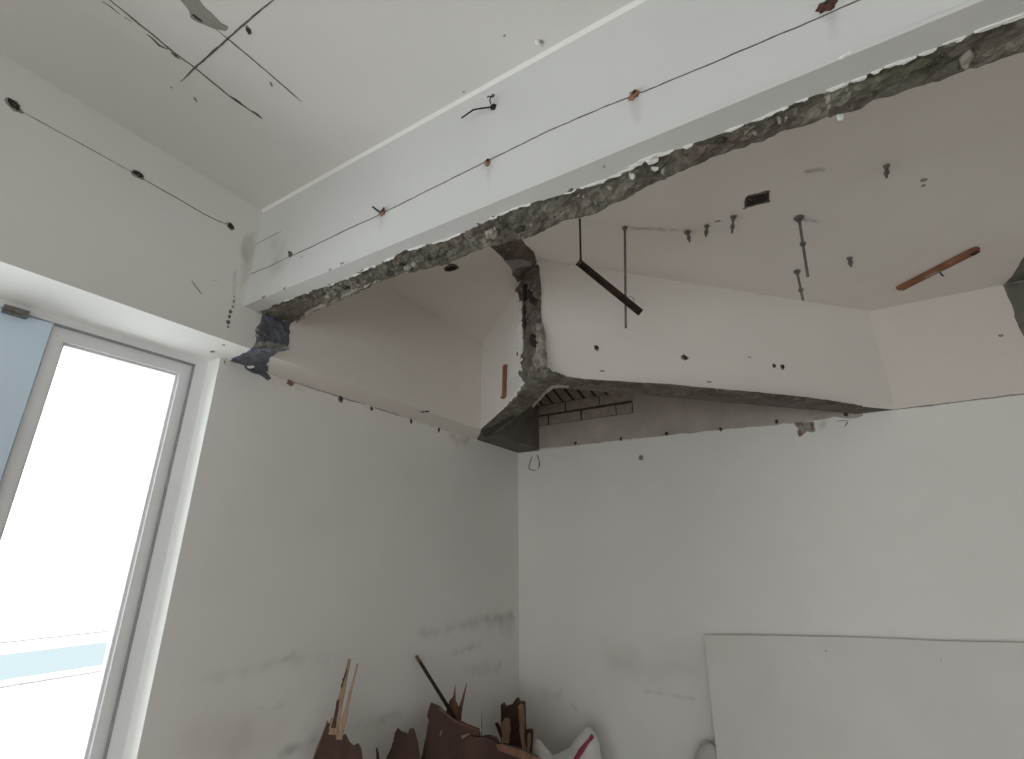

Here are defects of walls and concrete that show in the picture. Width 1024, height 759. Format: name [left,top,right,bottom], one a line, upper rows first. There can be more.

spalling [260,13,1024,324]
peeling [477,265,881,453]